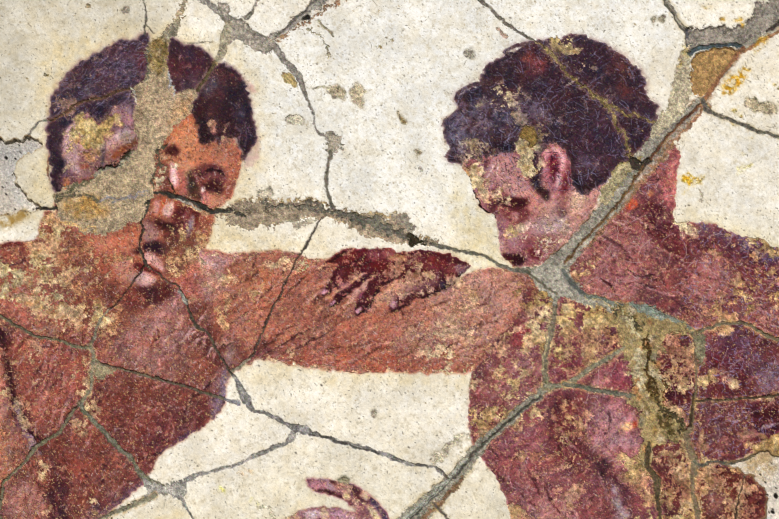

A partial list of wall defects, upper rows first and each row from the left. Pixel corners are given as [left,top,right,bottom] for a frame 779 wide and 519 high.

crack [27,88,131,139]
spalling [0,0,198,340]
crack [143,0,155,35]
crack [150,144,229,214]
crack [184,0,348,210]
crack [429,0,779,399]
peeling [743,237,779,259]
crack [0,198,549,519]
crack [635,304,779,519]
peeling [745,434,779,457]